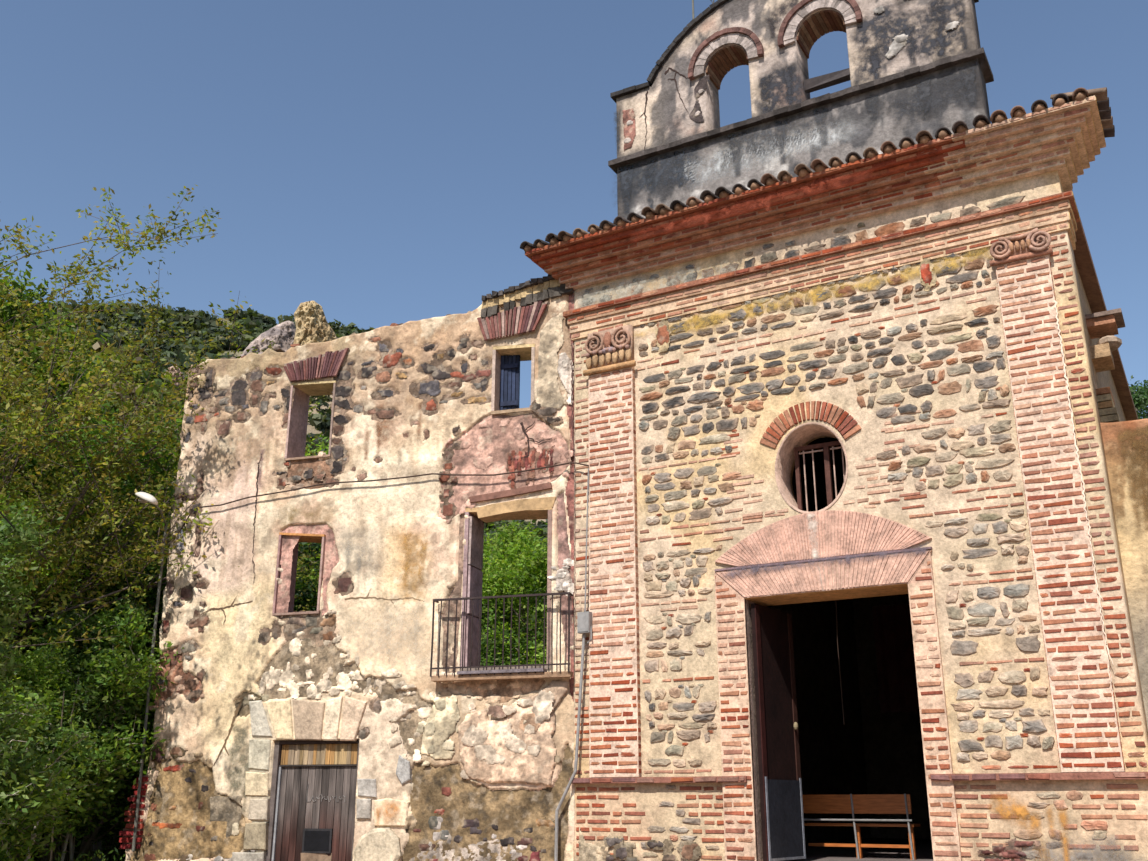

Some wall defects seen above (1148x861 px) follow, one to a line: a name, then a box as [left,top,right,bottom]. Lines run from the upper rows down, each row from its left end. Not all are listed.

mould [853,0,966,81]
crack [640,67,688,150]
damp [618,67,840,212]
mould [865,67,976,127]
spalling [183,365,295,443]
flaking render [235,293,701,861]
flaking render [129,742,256,861]